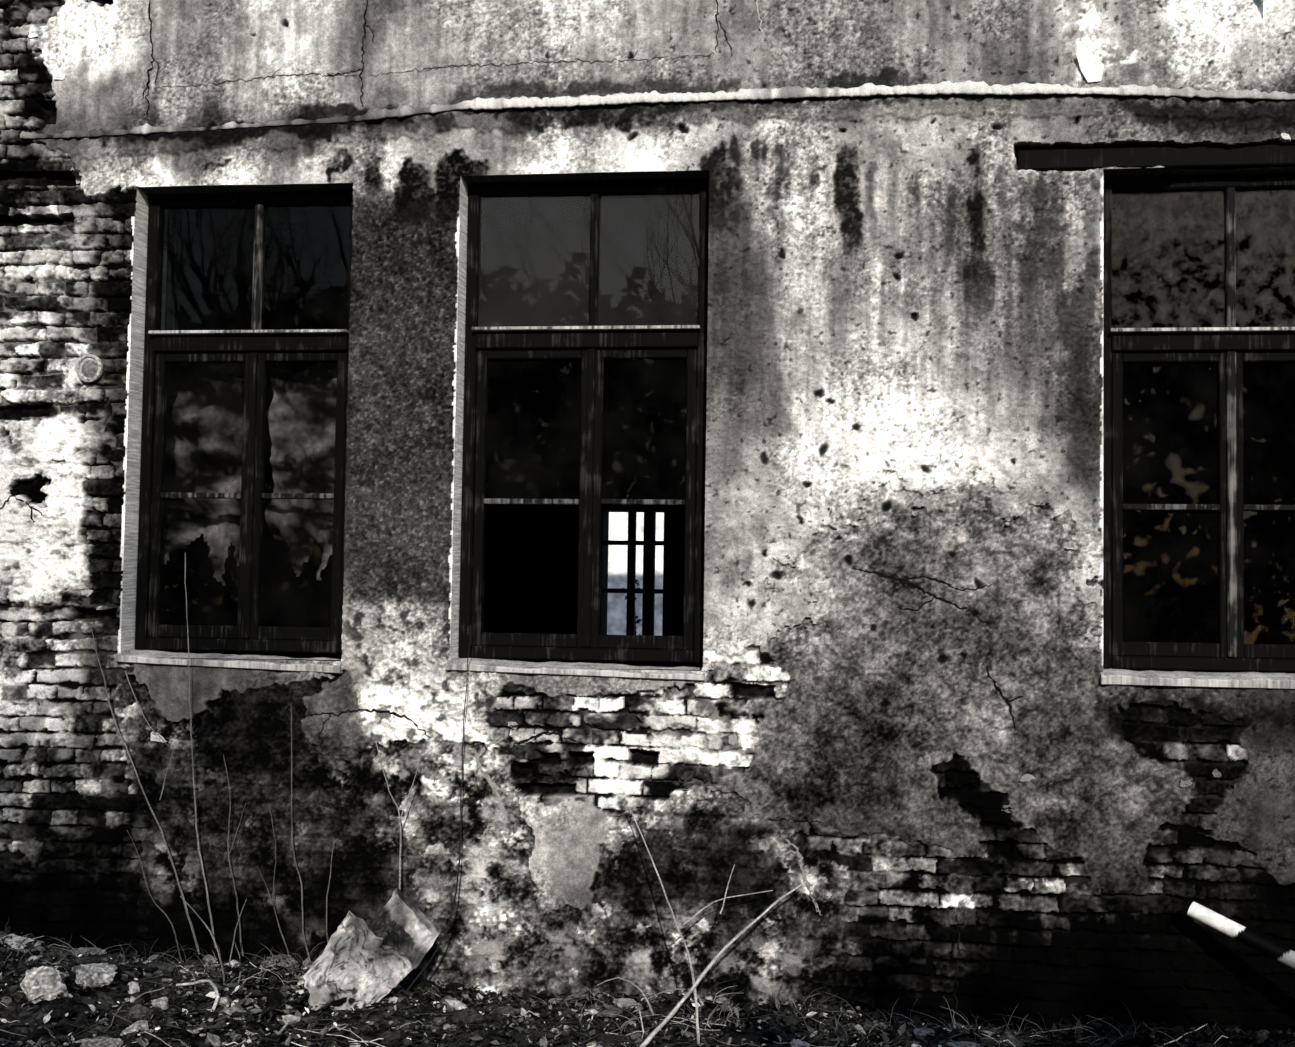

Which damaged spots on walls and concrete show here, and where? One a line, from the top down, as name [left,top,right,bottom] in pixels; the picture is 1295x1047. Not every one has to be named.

crack [142,0,732,122]
leakage [699,135,789,337]
flaking render [778,247,788,261]
leakage [810,145,875,253]
flaking render [892,250,906,282]
leakage [944,147,1100,456]
spalling [1014,133,1295,164]
flaking render [0,0,155,955]
flaking render [760,449,770,466]
flaking render [811,387,835,404]
flaking render [819,440,829,458]
flaking render [485,462,1295,1035]